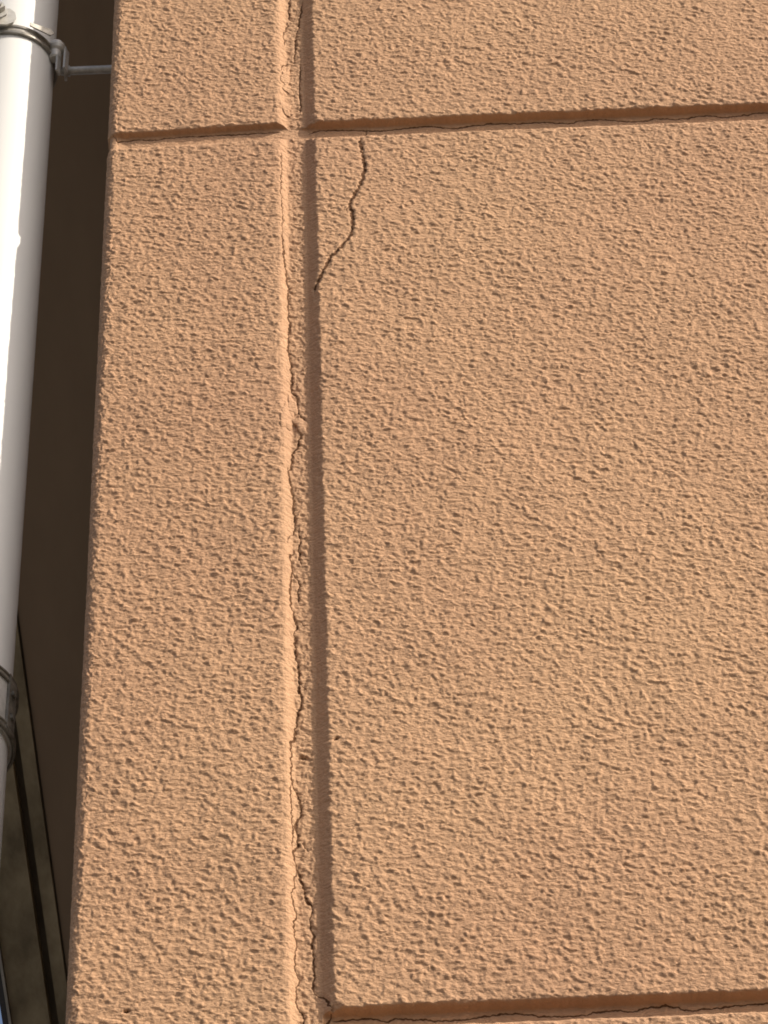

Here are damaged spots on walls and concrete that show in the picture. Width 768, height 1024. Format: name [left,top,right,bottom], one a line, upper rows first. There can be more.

crack [280,154,768,1024]
crack [309,113,768,292]